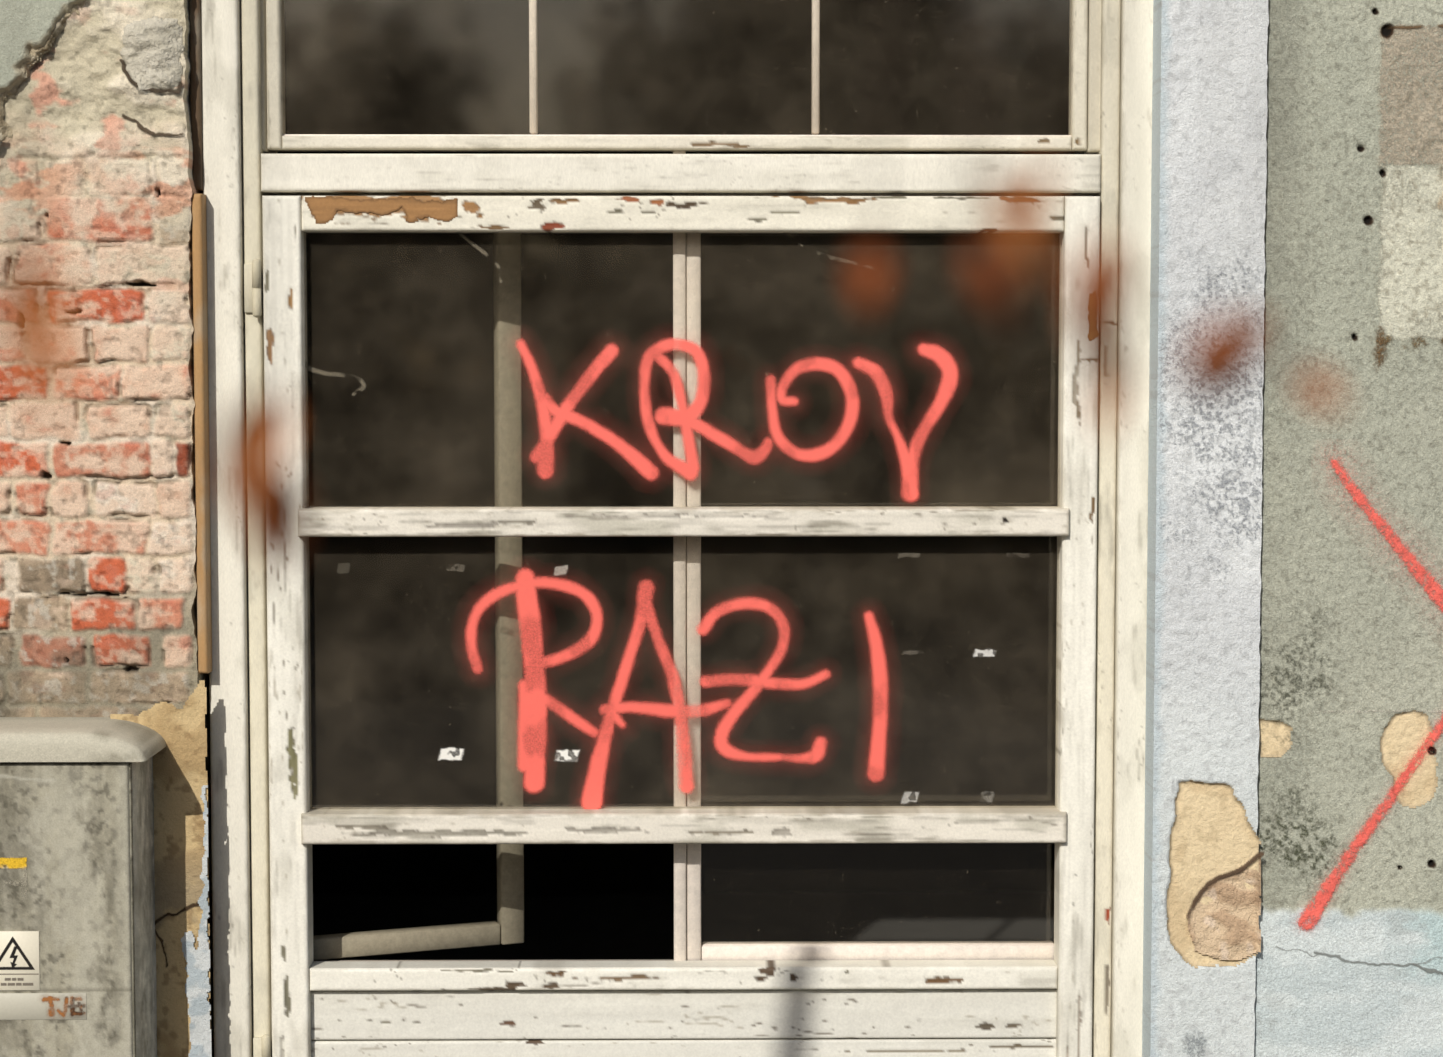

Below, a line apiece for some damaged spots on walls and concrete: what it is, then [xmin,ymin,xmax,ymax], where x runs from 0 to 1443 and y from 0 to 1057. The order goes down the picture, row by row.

flaking render [0,0,86,146]
peeling [305,196,458,224]
flaking render [1259,719,1293,757]
flaking render [1380,710,1438,808]
flaking render [110,680,212,1057]
flaking render [1167,780,1264,968]
crack [1278,947,1443,975]